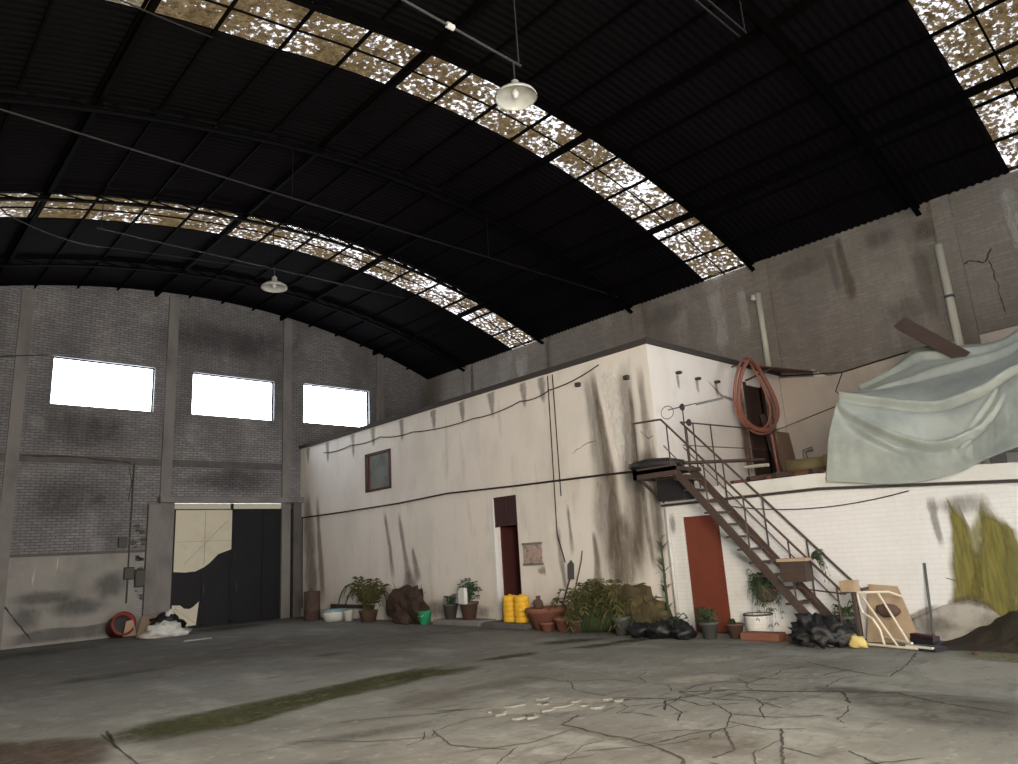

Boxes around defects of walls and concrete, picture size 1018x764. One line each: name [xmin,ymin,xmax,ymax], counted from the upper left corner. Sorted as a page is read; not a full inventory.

crack [964,248,1007,314]
water stain [594,390,642,583]
water stain [948,502,1018,616]
crack [298,652,1010,764]